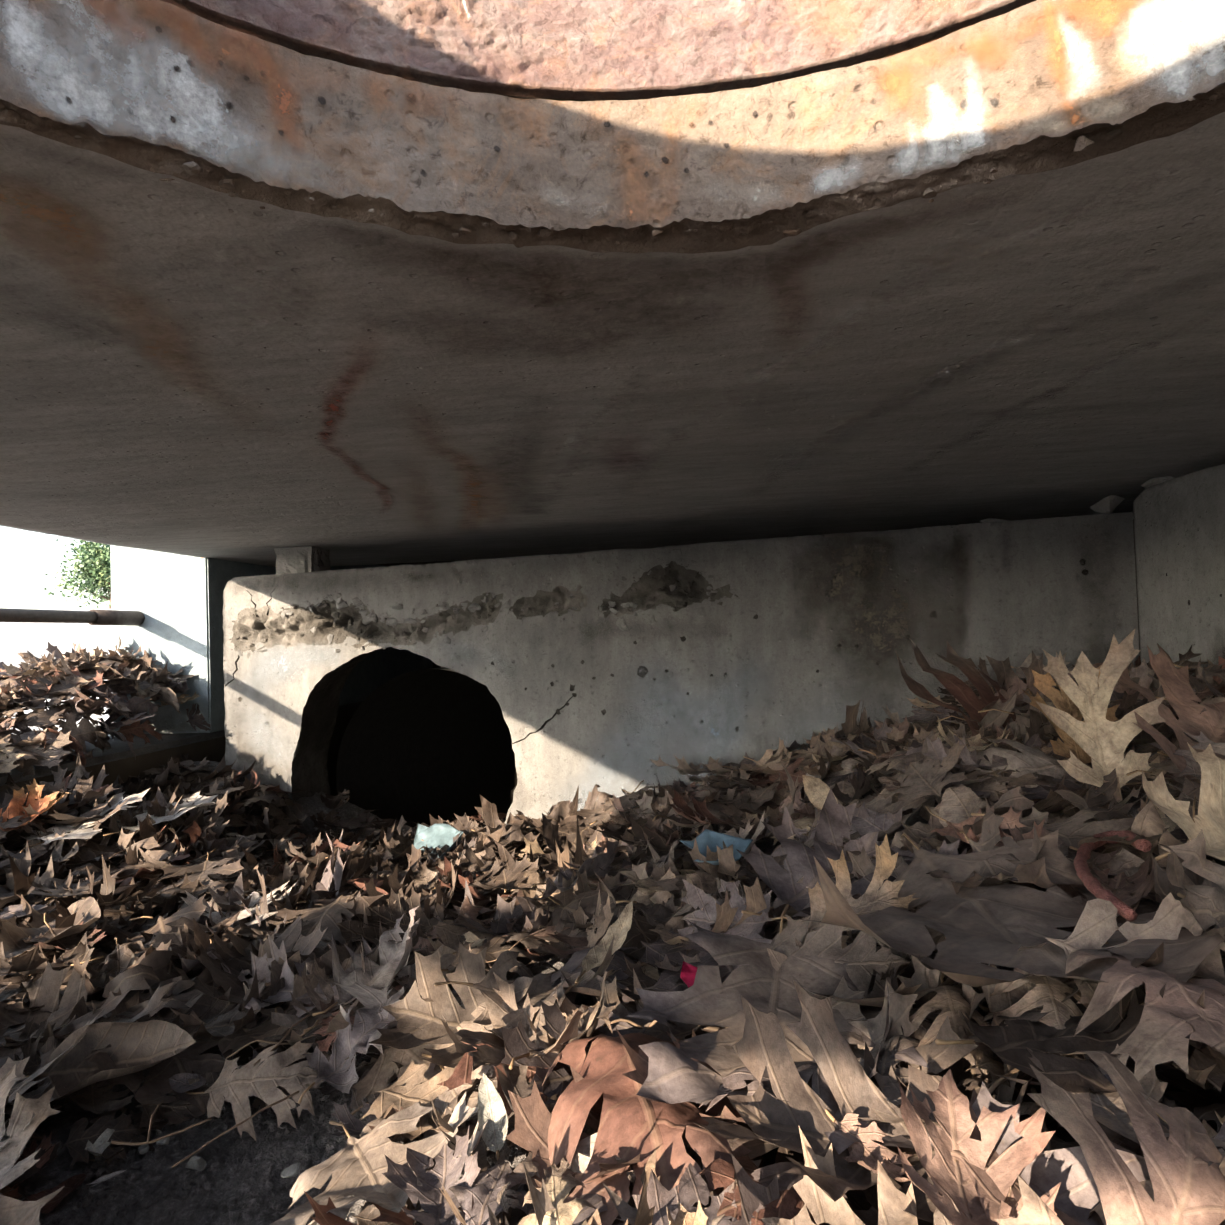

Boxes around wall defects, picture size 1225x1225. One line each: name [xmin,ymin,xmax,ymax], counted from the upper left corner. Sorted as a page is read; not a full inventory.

rust [1048,17,1065,76]
efflorescence [1131,0,1225,94]
efflorescence [899,94,984,171]
efflorescence [815,168,849,190]
spalling [229,549,740,659]
spalling [637,666,669,681]
crack [513,695,575,744]